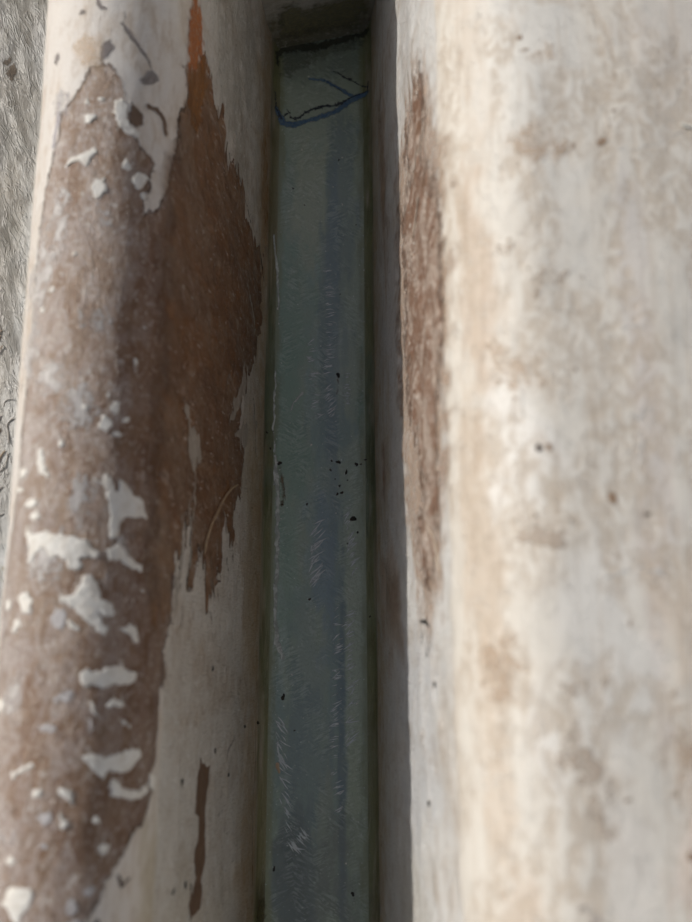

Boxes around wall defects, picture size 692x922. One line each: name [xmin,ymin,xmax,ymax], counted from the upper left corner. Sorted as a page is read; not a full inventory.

peeling [0,39,264,922]
rust [183,0,210,133]